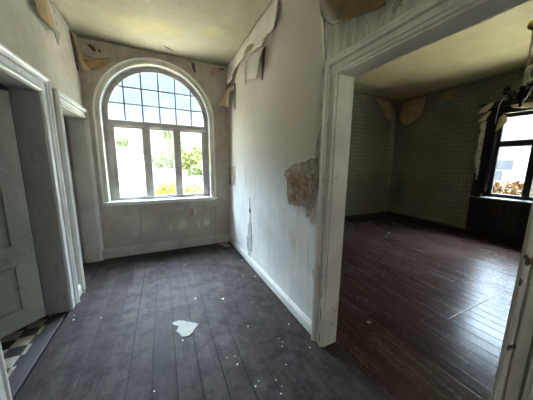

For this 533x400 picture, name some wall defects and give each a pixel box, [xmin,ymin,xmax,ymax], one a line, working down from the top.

flaking render [81,44,112,73]
flaking render [283,0,419,221]